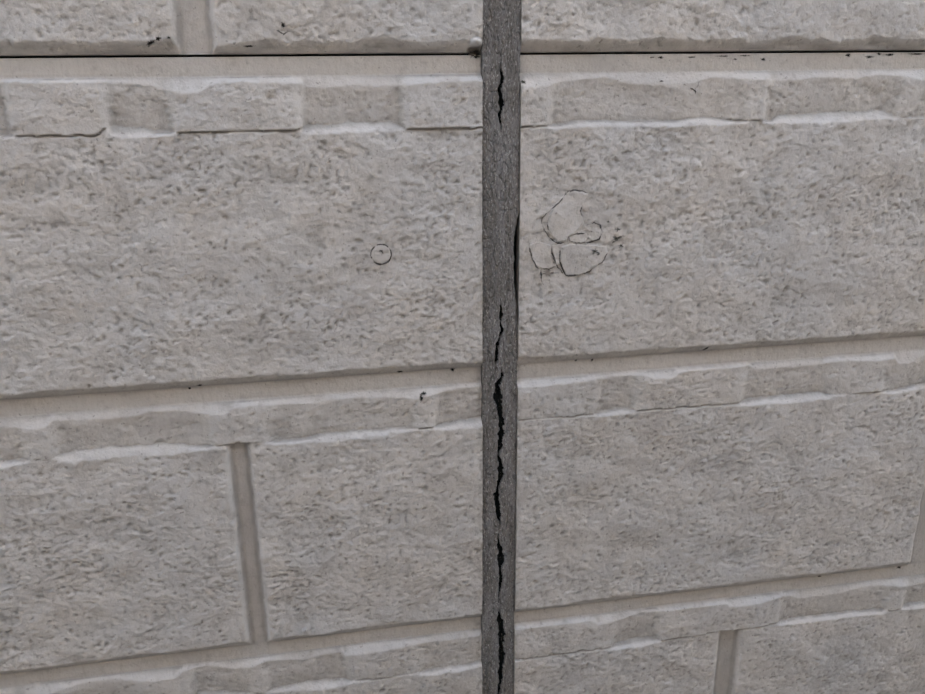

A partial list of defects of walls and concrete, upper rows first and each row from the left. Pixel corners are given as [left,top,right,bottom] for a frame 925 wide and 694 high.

crack [497,71,505,123]
peeling [529,189,623,281]
crack [493,305,506,694]